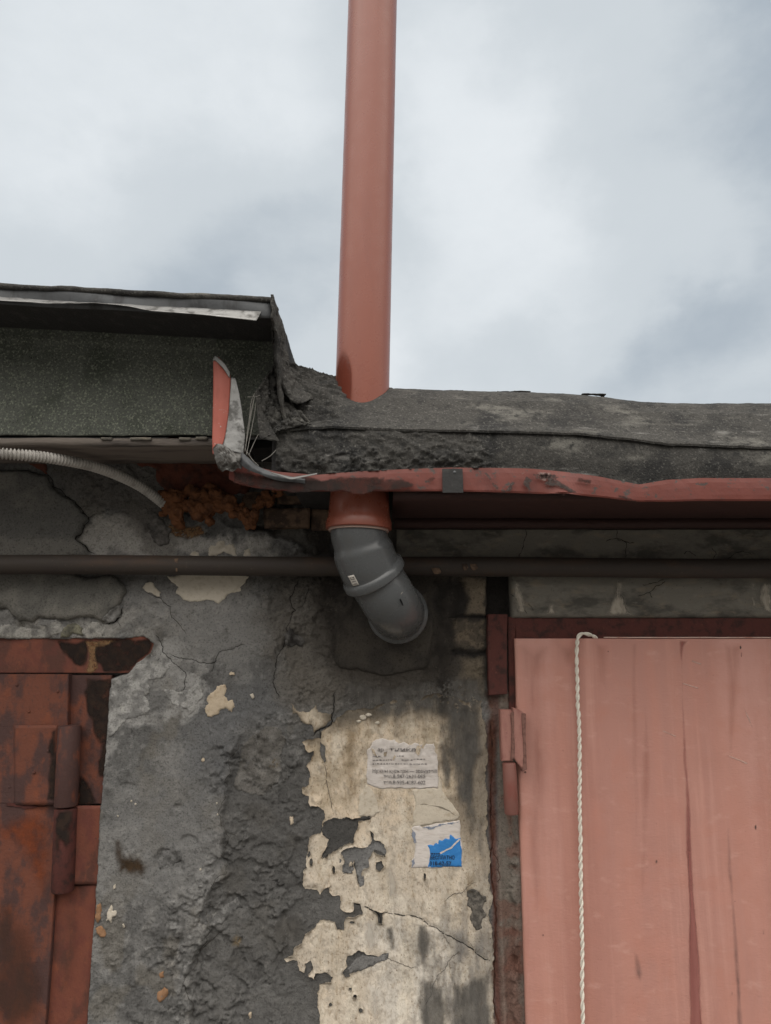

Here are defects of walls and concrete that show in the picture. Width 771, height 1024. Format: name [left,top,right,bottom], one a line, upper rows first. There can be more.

peeling [137,463,251,495]
peeling [143,582,161,597]
peeling [167,575,248,604]
peeling [190,541,251,556]
crack [150,594,244,690]
crack [273,580,309,696]
rust [59,639,152,776]
rust [78,777,94,804]
peeling [284,693,495,1024]
crack [354,723,500,1024]